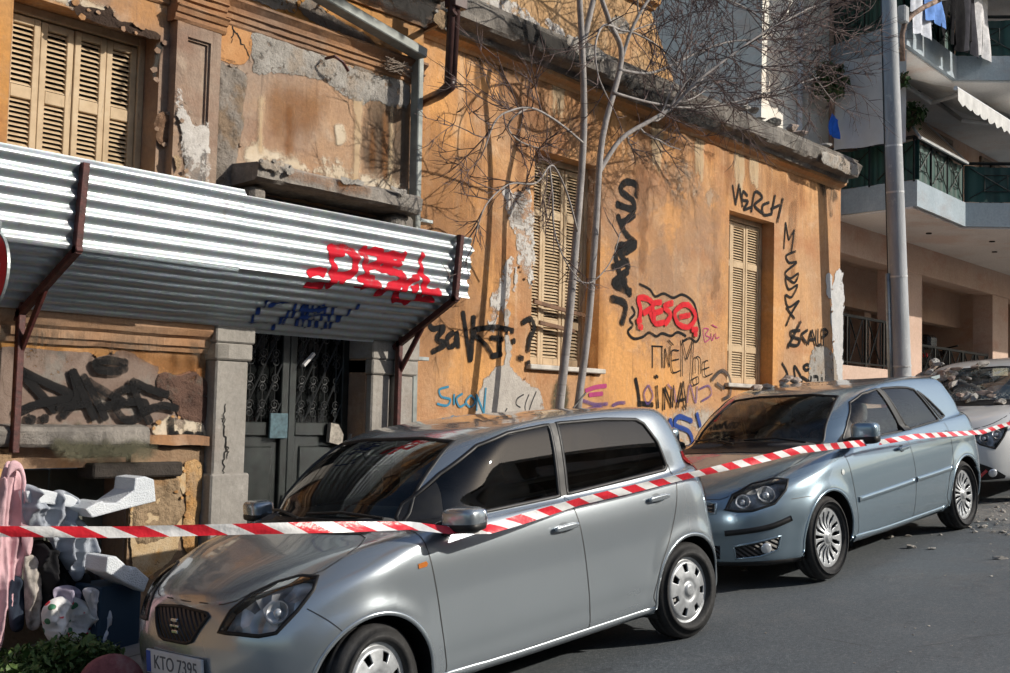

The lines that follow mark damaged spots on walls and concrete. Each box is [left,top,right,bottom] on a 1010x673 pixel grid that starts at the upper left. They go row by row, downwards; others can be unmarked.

spalling [56,0,146,35]
flaking render [480,0,607,62]
flaking render [154,62,249,187]
flaking render [488,186,536,344]
flaking render [809,268,845,381]
peeling [2,357,24,396]
flaking render [152,371,208,436]
crack [221,404,230,474]
flaking render [130,467,190,579]